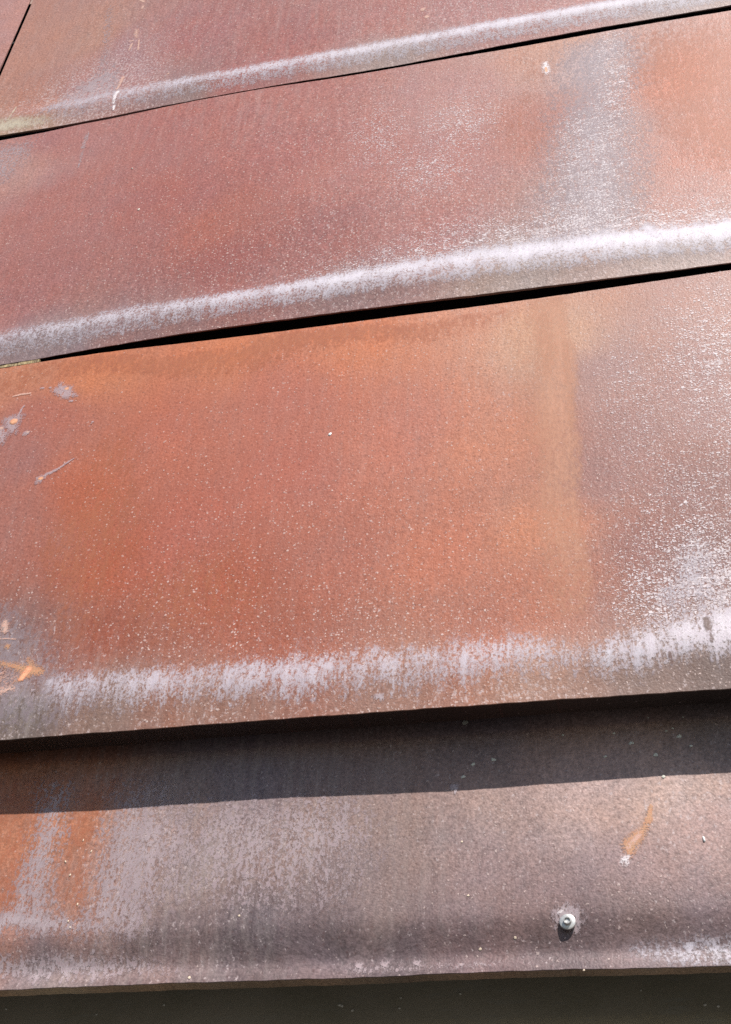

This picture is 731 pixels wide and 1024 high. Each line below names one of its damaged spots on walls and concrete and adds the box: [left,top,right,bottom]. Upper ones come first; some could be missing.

water stain [0,274,731,724]
rust [0,658,45,695]
rust [620,804,653,866]